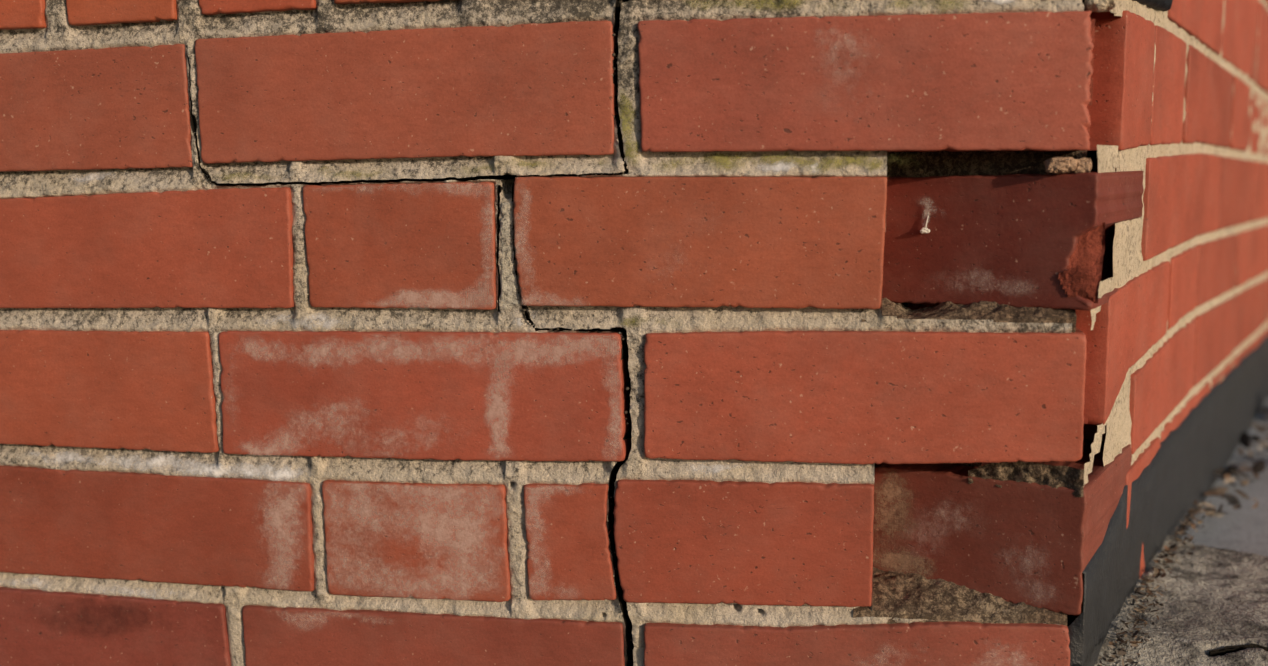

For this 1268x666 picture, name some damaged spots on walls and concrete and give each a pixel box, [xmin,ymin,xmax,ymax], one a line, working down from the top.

spalling [1058,222,1105,303]
crack [186,0,634,666]
leakage [385,485,489,590]